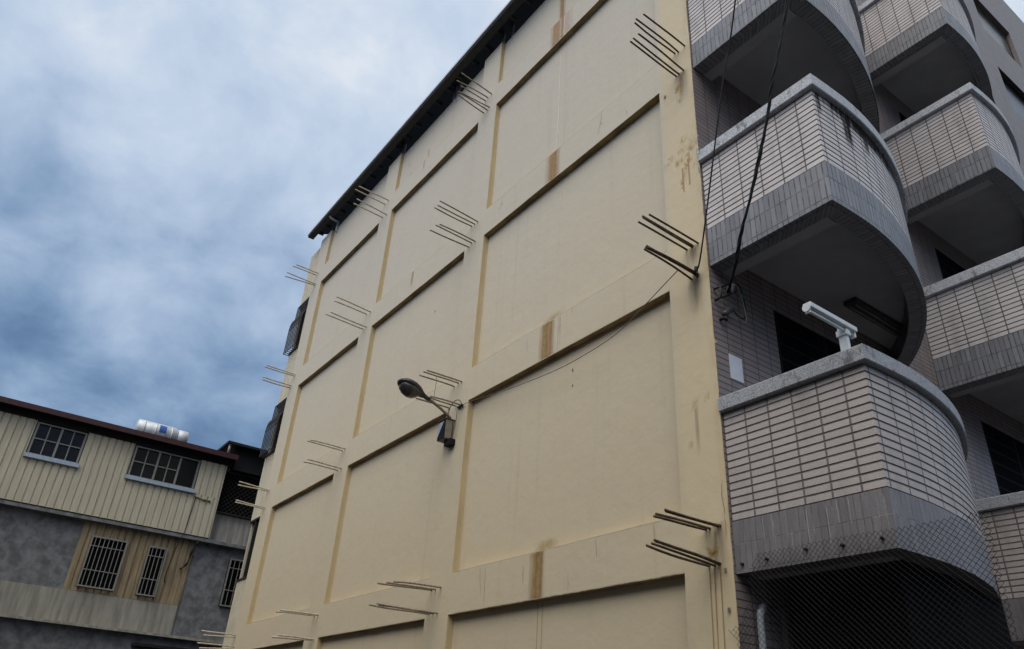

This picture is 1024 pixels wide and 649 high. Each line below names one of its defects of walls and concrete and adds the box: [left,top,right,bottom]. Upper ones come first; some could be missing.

rust [548,150,557,182]
rust [541,321,551,359]
rust [531,551,542,598]